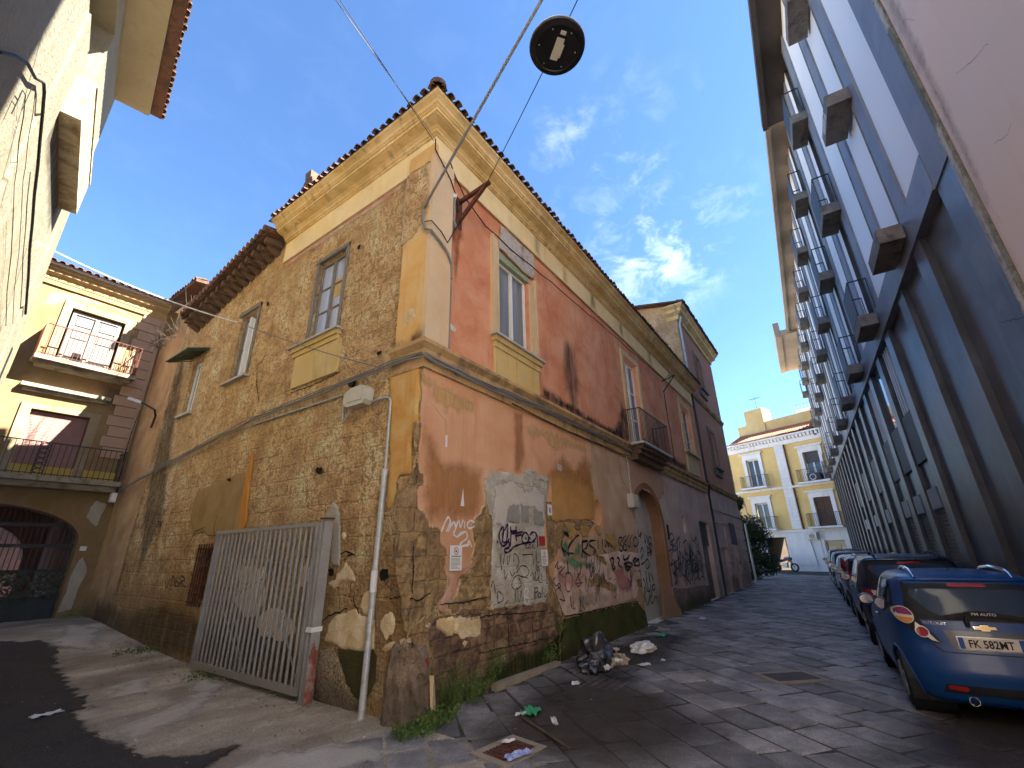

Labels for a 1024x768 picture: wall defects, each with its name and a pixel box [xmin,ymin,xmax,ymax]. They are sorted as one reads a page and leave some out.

leakage [544,344,630,439]
leakage [143,365,182,553]
peeling [86,501,107,526]
peeling [57,557,87,613]
spalling [316,421,617,715]
leakage [95,611,297,678]
rust [302,641,318,707]